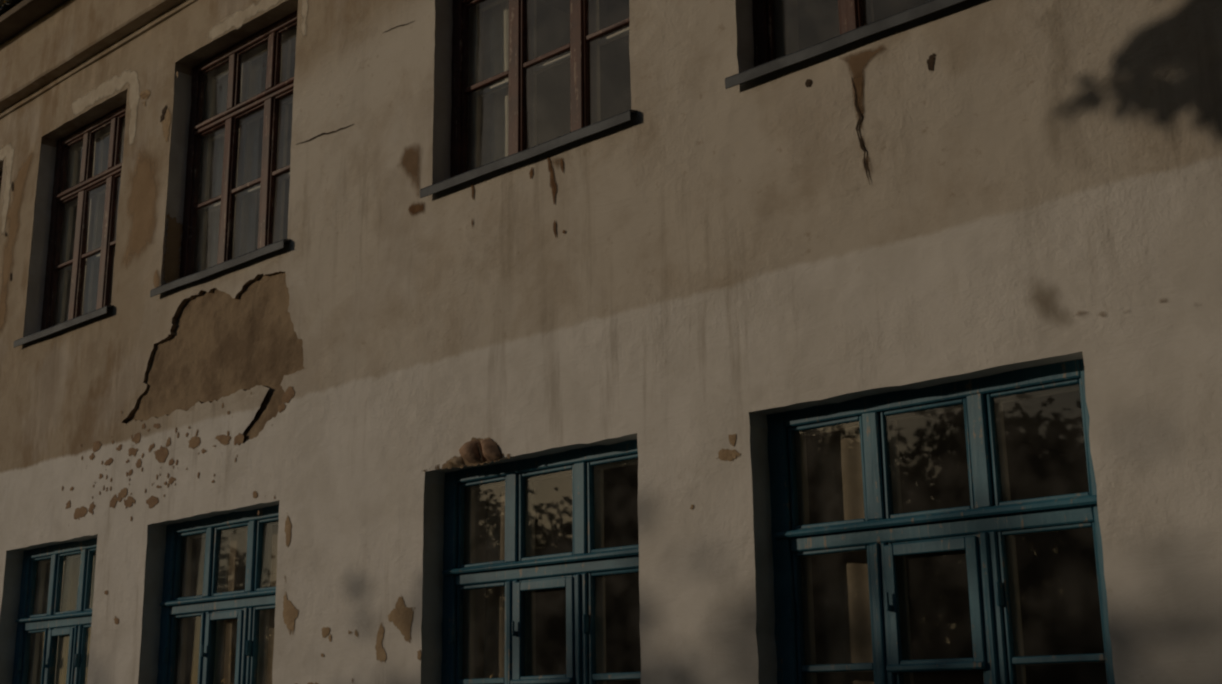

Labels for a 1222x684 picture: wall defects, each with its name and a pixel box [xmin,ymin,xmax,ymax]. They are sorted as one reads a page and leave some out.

corrosion [845,47,884,118]
flaking render [62,153,309,521]
peeling [716,434,740,461]
peeling [283,592,299,634]
peeling [375,595,421,662]